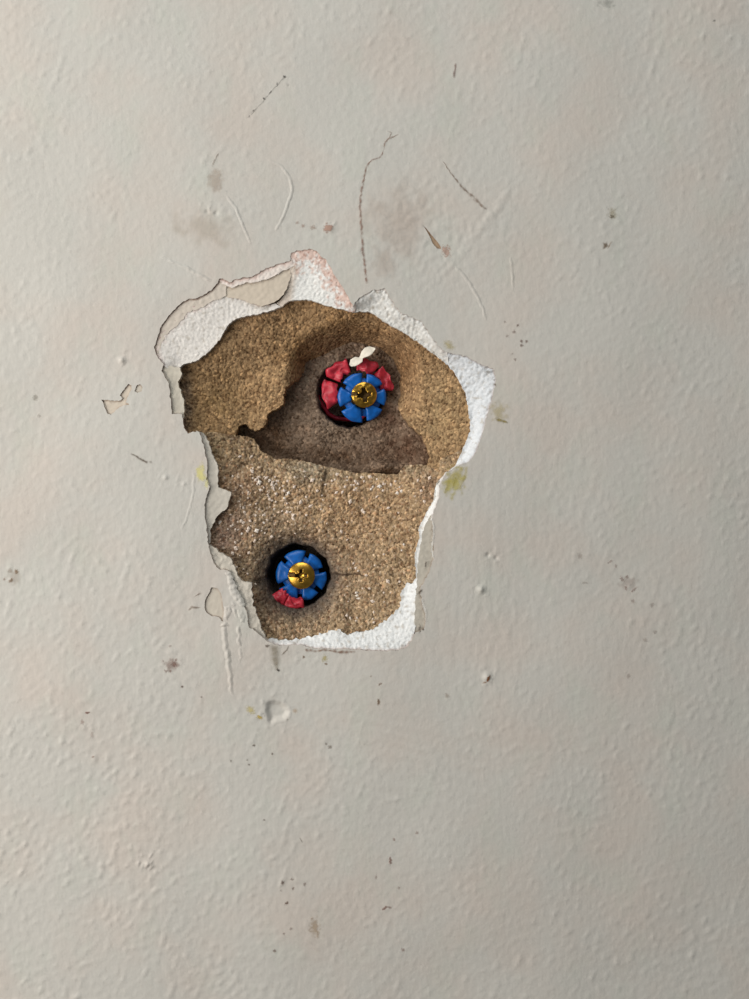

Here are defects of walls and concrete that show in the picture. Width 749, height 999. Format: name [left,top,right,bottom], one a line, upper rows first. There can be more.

peeling [102,384,142,415]
flaking render [154,249,496,651]